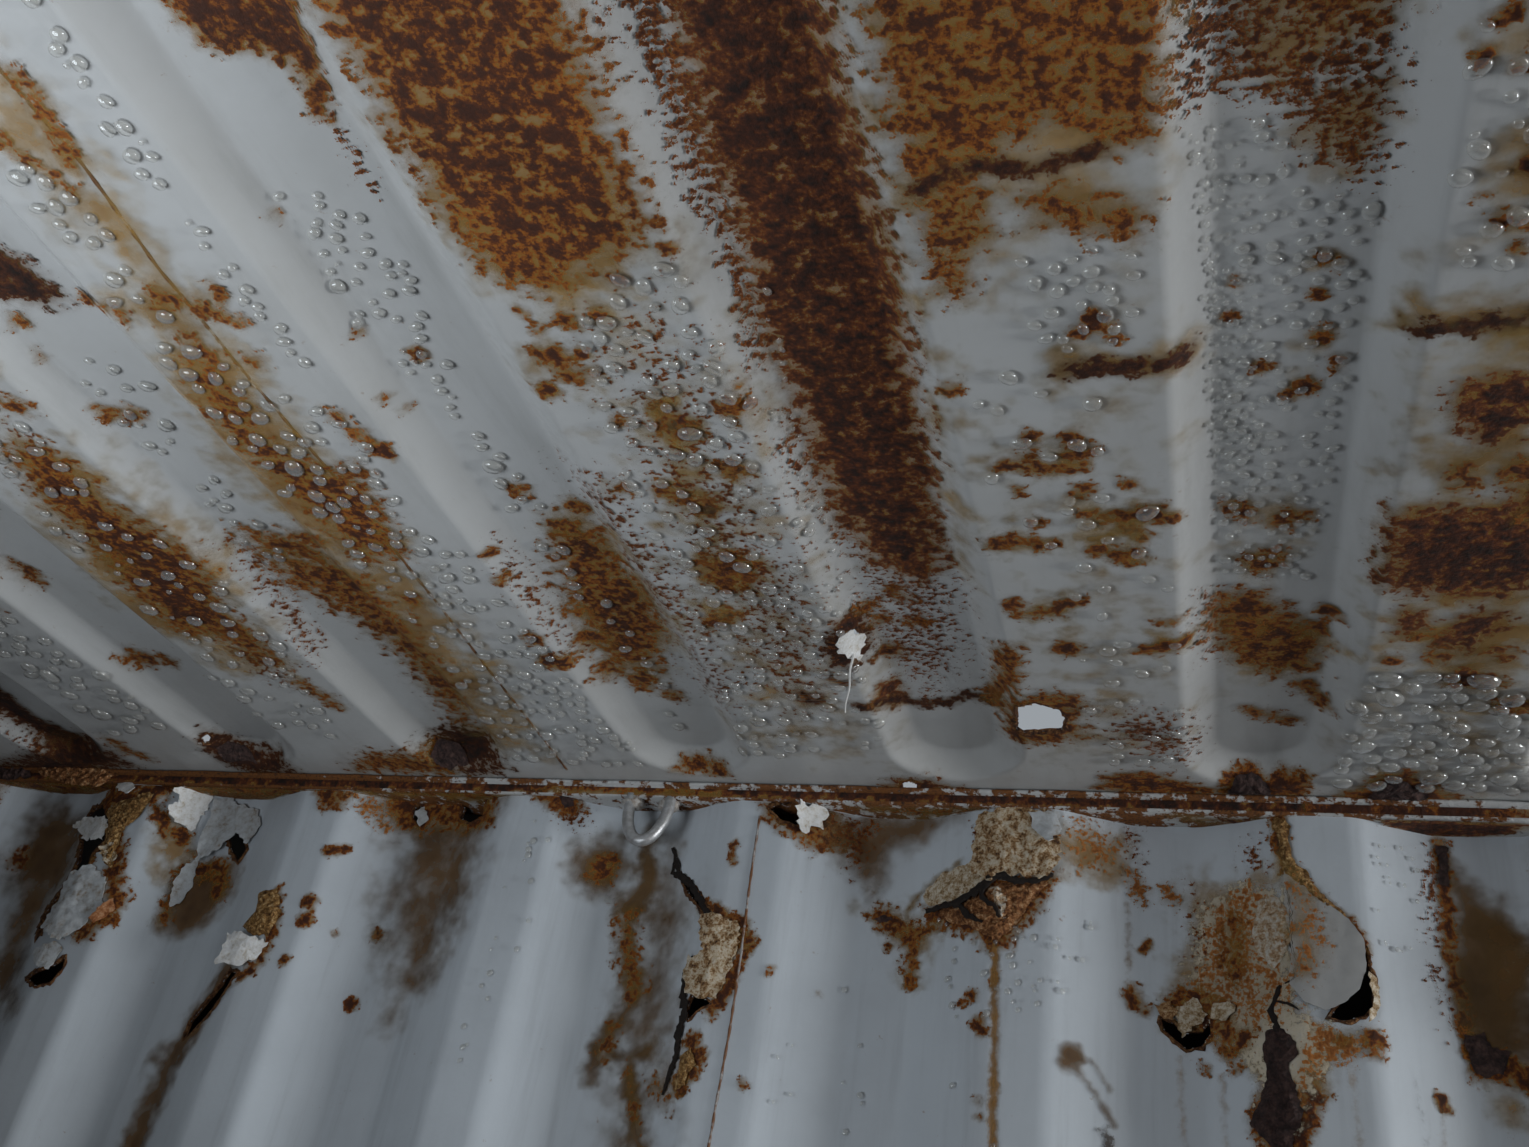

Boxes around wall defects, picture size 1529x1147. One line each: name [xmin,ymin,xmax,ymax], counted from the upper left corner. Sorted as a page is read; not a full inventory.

rust [161,0,381,202]
rust [311,0,1417,796]
rust [0,243,1529,1097]
peeling [24,782,261,989]
peeling [214,882,287,982]
rust [585,826,683,1147]
peeling [671,896,761,1100]
rust [954,939,1000,1147]
peeling [917,807,1062,953]
peeling [1154,997,1235,1038]
rust [1058,816,1392,1147]
peeling [1266,816,1381,1025]